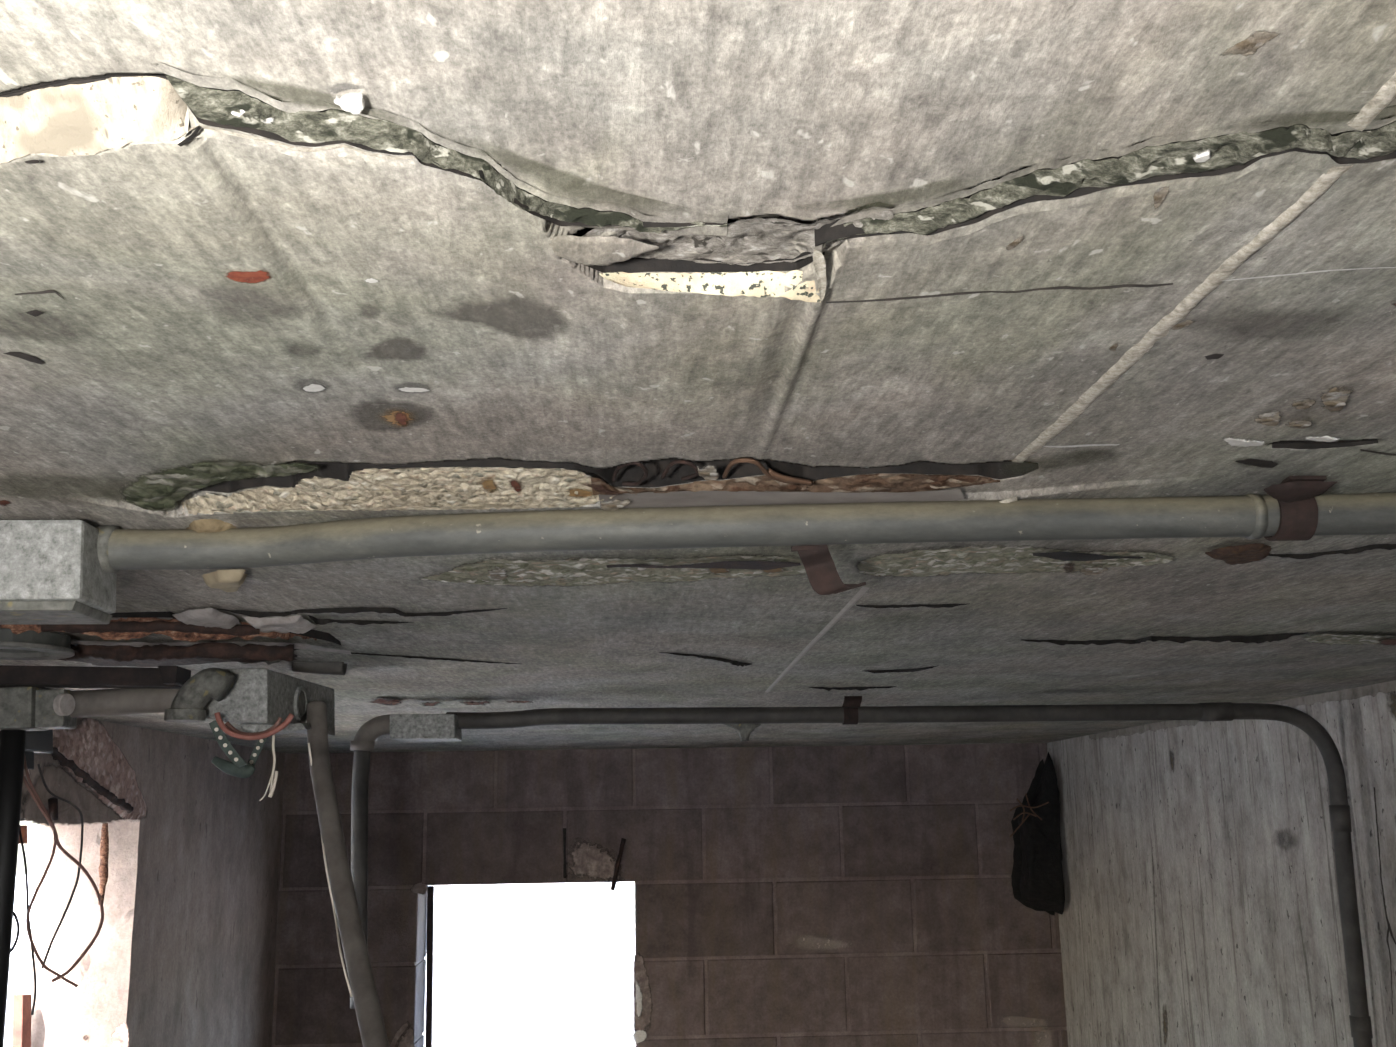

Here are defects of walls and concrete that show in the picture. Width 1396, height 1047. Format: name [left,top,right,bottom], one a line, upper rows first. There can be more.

spalling [0,76,201,164]
crack [0,61,1396,273]
rust [226,270,270,283]
spalling [598,249,826,302]
crack [826,283,1173,303]
spalling [0,444,1120,516]
spalling [421,554,806,587]
spalling [857,545,1174,577]
crack [1249,544,1396,566]
crack [217,607,524,666]
crack [1014,632,1309,646]
crack [659,652,752,667]